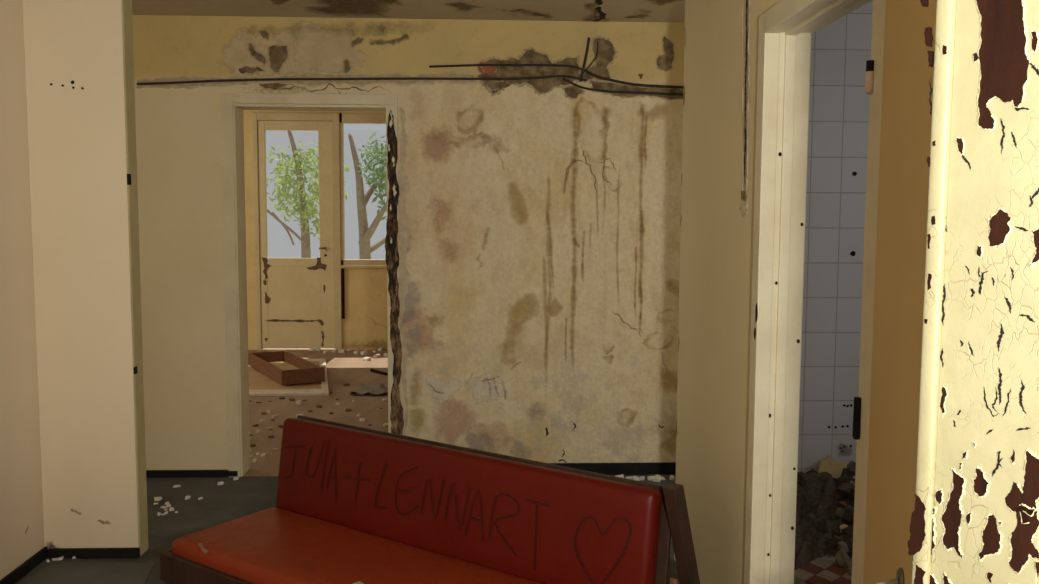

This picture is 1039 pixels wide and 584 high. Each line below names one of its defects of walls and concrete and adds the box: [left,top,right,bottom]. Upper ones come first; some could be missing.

leakage [311,0,391,15]
peeling [135,21,684,105]
spalling [924,27,947,67]
peeling [973,0,1039,132]
peeling [955,136,965,156]
crack [1000,107,1030,154]
crack [1015,188,1039,231]
peeling [975,208,1013,259]
peeling [1028,226,1039,268]
spalling [385,107,411,436]
peeling [940,386,949,418]
peeling [907,441,1039,584]